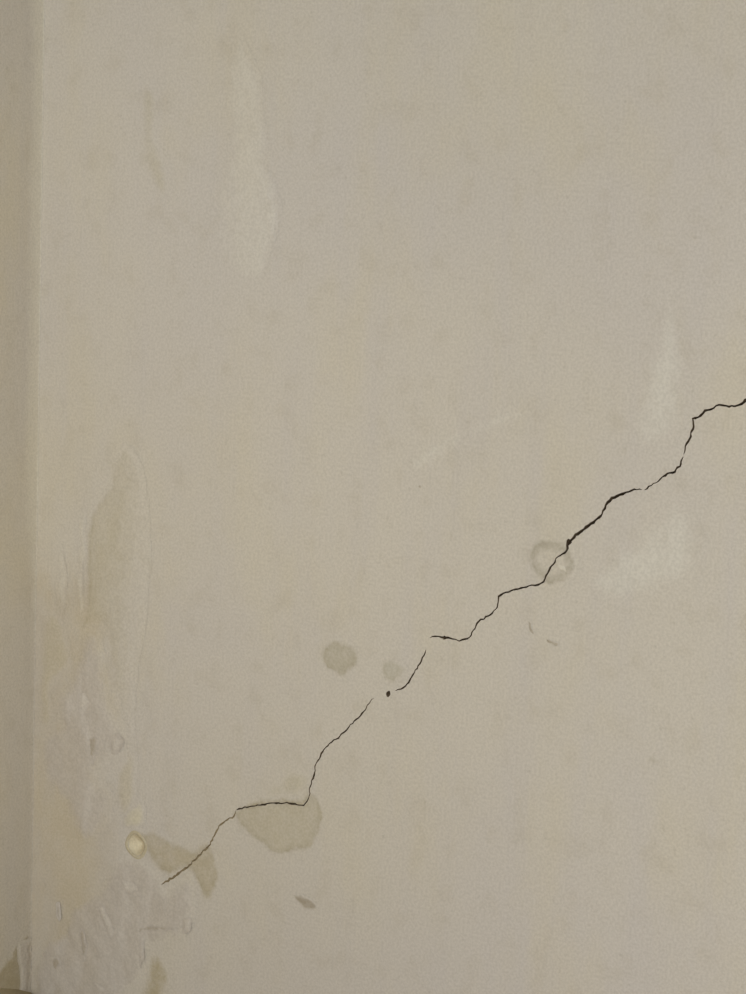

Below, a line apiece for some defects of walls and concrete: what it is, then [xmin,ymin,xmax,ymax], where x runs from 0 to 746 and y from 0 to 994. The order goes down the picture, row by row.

damp [37,444,222,904]
damp [317,636,363,681]
crack [162,398,746,884]
damp [230,765,327,859]
damp [132,950,173,994]